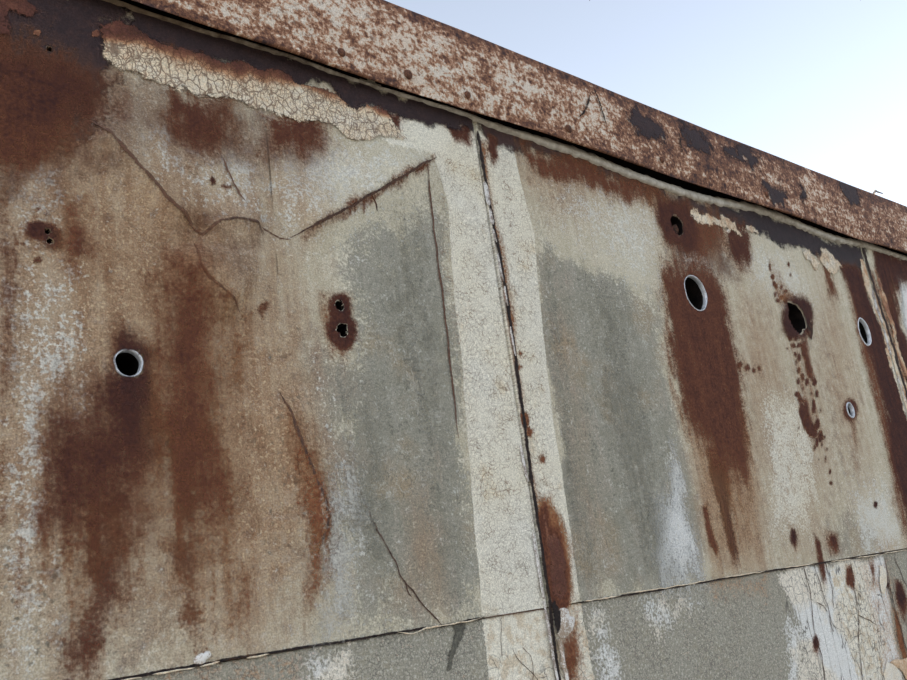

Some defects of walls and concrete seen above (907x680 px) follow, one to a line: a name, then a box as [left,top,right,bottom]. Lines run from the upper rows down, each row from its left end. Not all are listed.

rust [257,113,327,159]
peeling [0,0,907,419]
rust [31,228,253,680]
crack [90,120,561,680]
rust [321,293,358,358]
rust [648,189,761,566]
rust [769,262,832,485]
rust [840,250,907,539]
crack [863,248,907,402]
rust [533,478,582,680]
peeling [879,566,887,594]
peeling [884,658,907,680]